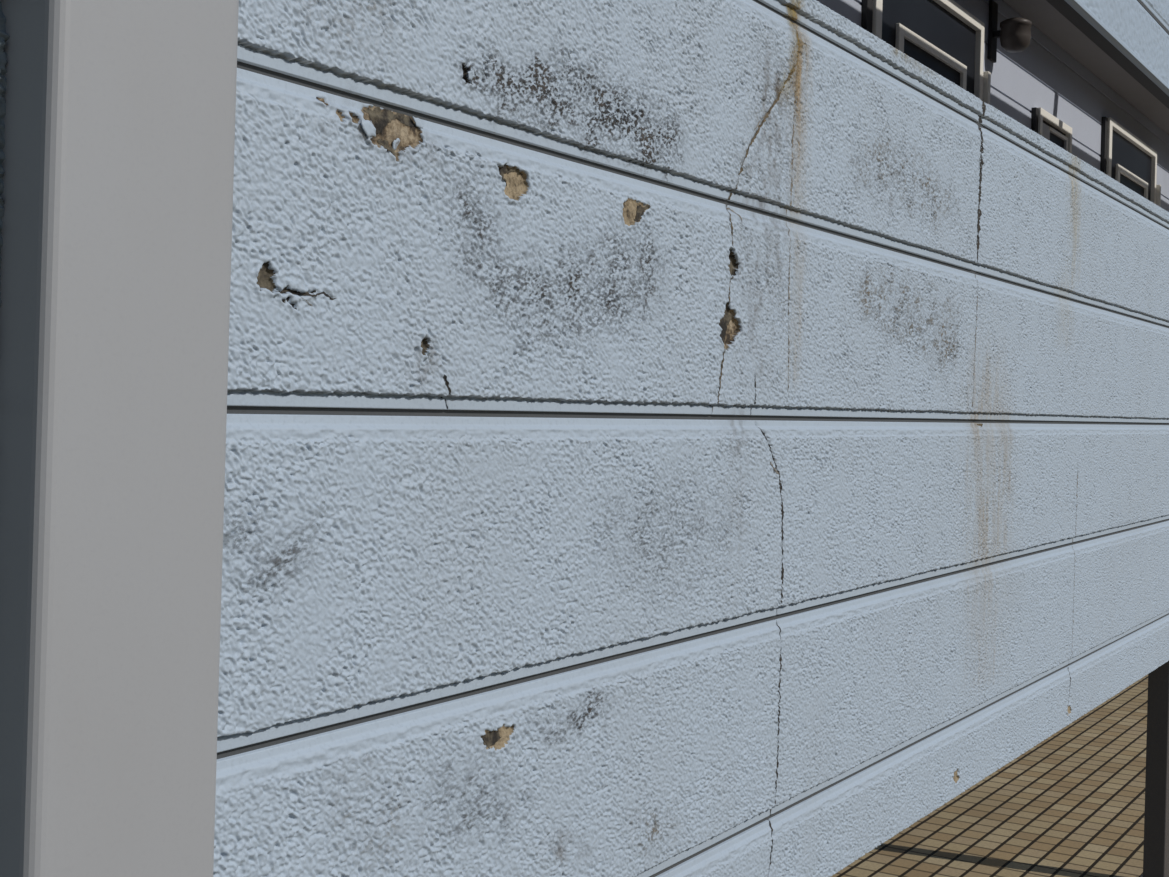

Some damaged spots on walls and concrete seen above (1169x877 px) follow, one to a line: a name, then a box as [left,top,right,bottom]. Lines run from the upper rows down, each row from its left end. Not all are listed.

rust [785,4,802,105]
spalling [316,97,423,161]
damp [465,54,680,175]
spalling [498,164,529,200]
spalling [622,198,651,226]
crack [726,12,800,396]
crack [972,102,986,412]
crack [273,289,336,306]
spalling [719,303,741,350]
crack [710,349,725,412]
crack [749,378,784,876]
spalling [481,725,514,751]